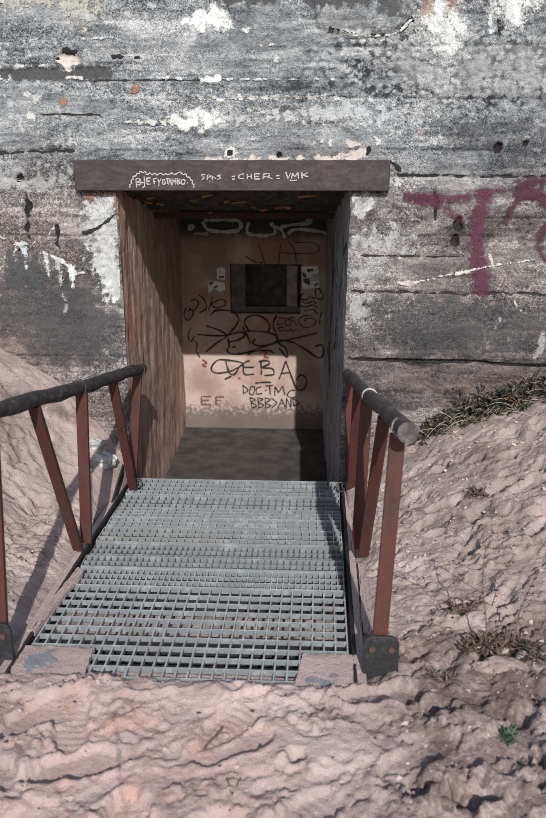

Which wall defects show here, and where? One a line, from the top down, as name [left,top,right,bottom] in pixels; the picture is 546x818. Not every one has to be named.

peeling [0,0,108,38]
spalling [180,1,250,33]
crack [323,18,416,39]
crack [496,19,504,35]
spalling [55,46,83,80]
damp [3,241,84,302]